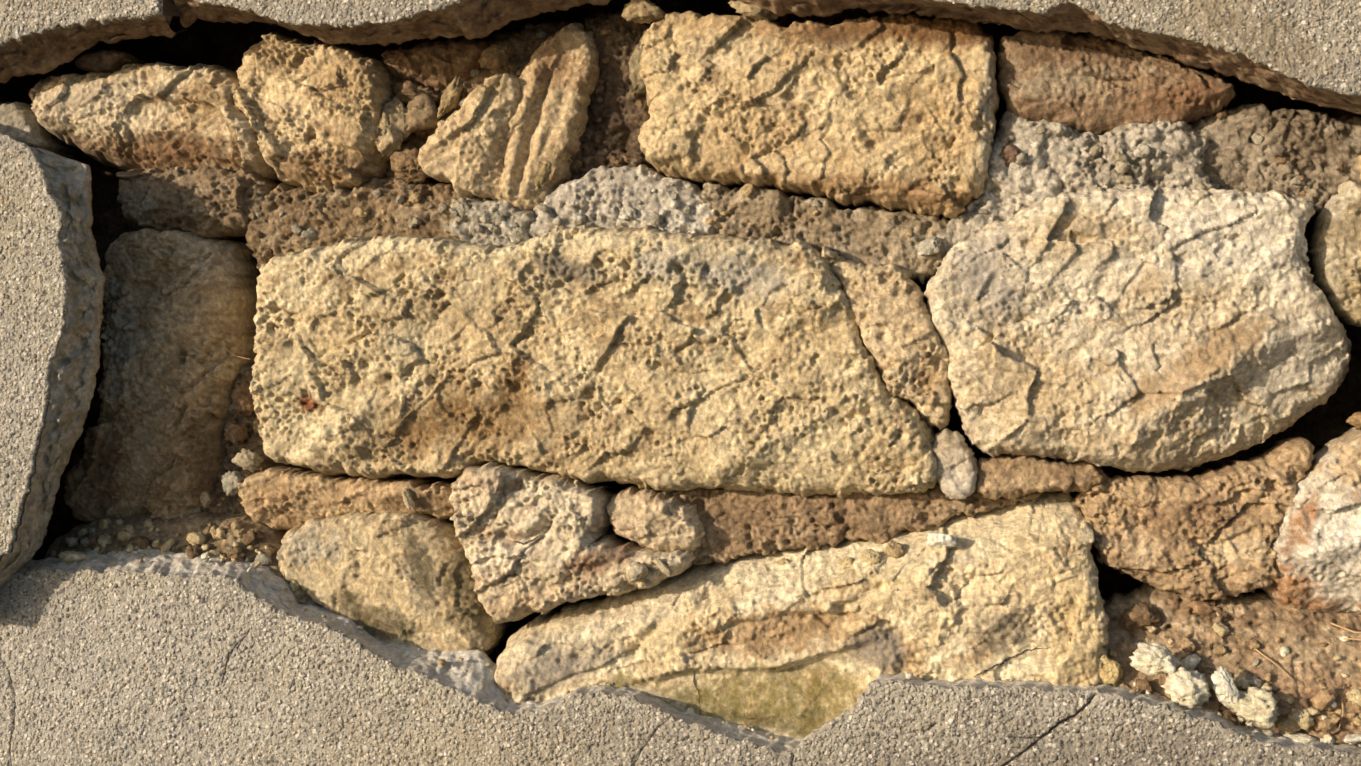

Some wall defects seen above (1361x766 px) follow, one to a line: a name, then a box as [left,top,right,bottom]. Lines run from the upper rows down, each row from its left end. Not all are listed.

crack [163,0,183,16]
spalling [0,0,611,84]
spalling [731,0,1361,116]
spalling [0,147,825,752]
crack [1003,695,1095,766]
spalling [874,672,1361,753]